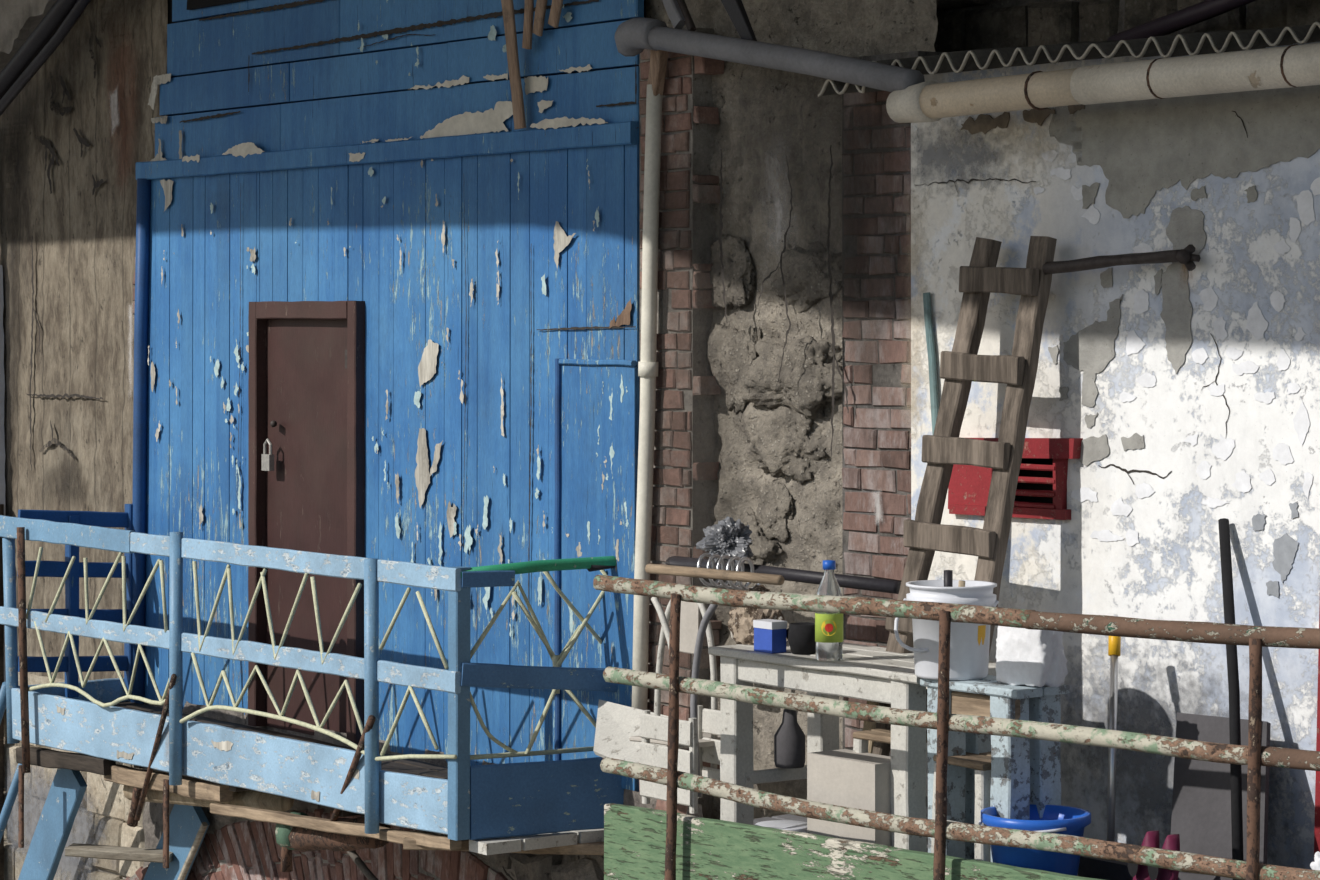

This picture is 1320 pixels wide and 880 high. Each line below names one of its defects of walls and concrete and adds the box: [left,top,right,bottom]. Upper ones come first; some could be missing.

peeling [349,101,513,177]
peeling [524,64,608,130]
crack [916,178,1036,192]
peeling [541,221,576,296]
crack [758,156,793,382]
crack [827,145,849,456]
peeling [961,85,1320,466]
peeling [414,328,449,408]
peeling [210,332,249,528]
peeling [372,390,512,566]
crack [1098,464,1172,484]
peeling [1252,514,1299,598]